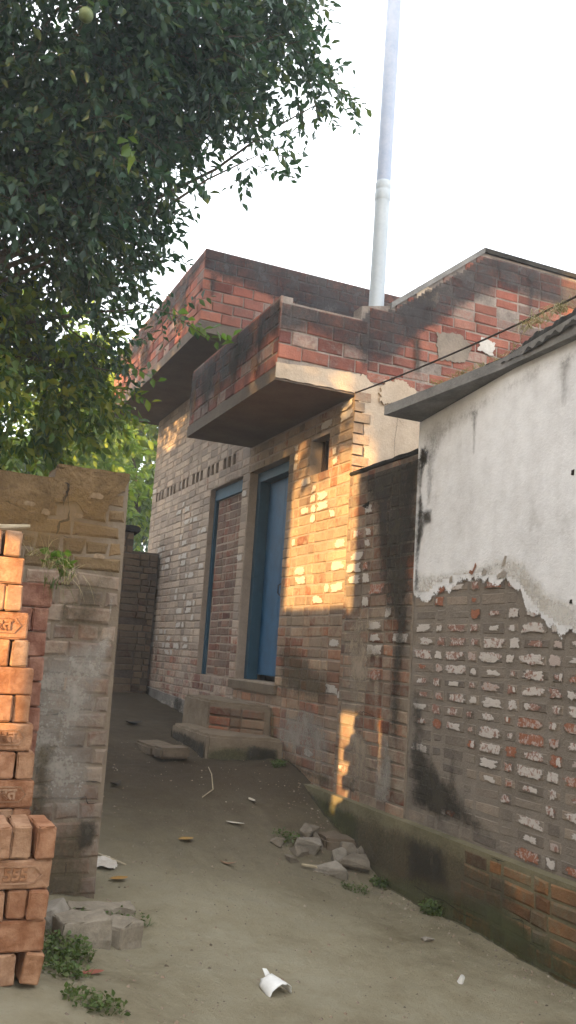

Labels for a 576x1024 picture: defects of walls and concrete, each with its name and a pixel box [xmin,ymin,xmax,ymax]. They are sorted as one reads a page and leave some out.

peeling [321,398,353,430]
flaking render [378,379,416,405]
crack [57,482,70,538]
peeling [293,445,335,523]
peeling [294,567,305,584]
peeling [312,528,576,878]
water stain [340,812,525,947]